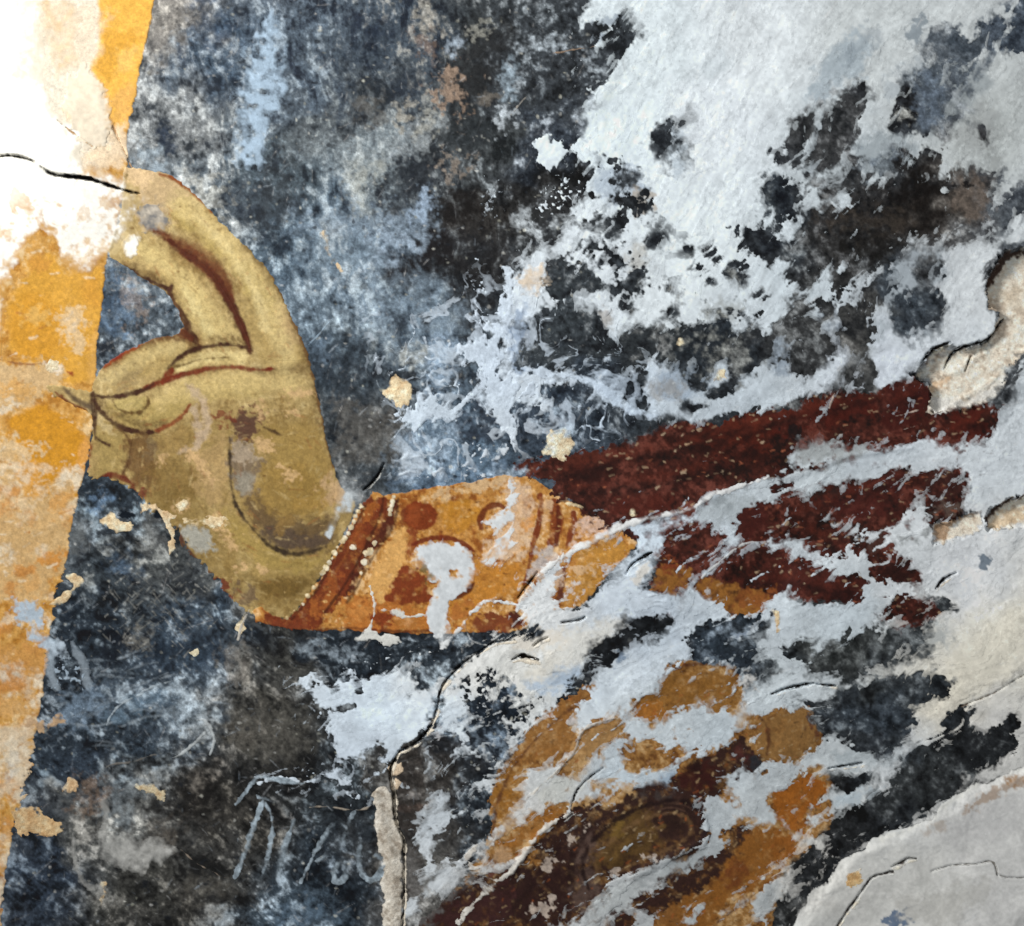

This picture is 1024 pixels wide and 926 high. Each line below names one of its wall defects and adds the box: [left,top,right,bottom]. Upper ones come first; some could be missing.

peeling [59,61,115,151]
crack [0,120,140,194]
peeling [121,203,170,260]
peeling [254,0,1024,926]
crack [388,616,585,926]
crack [836,857,917,926]
crack [942,860,1024,879]